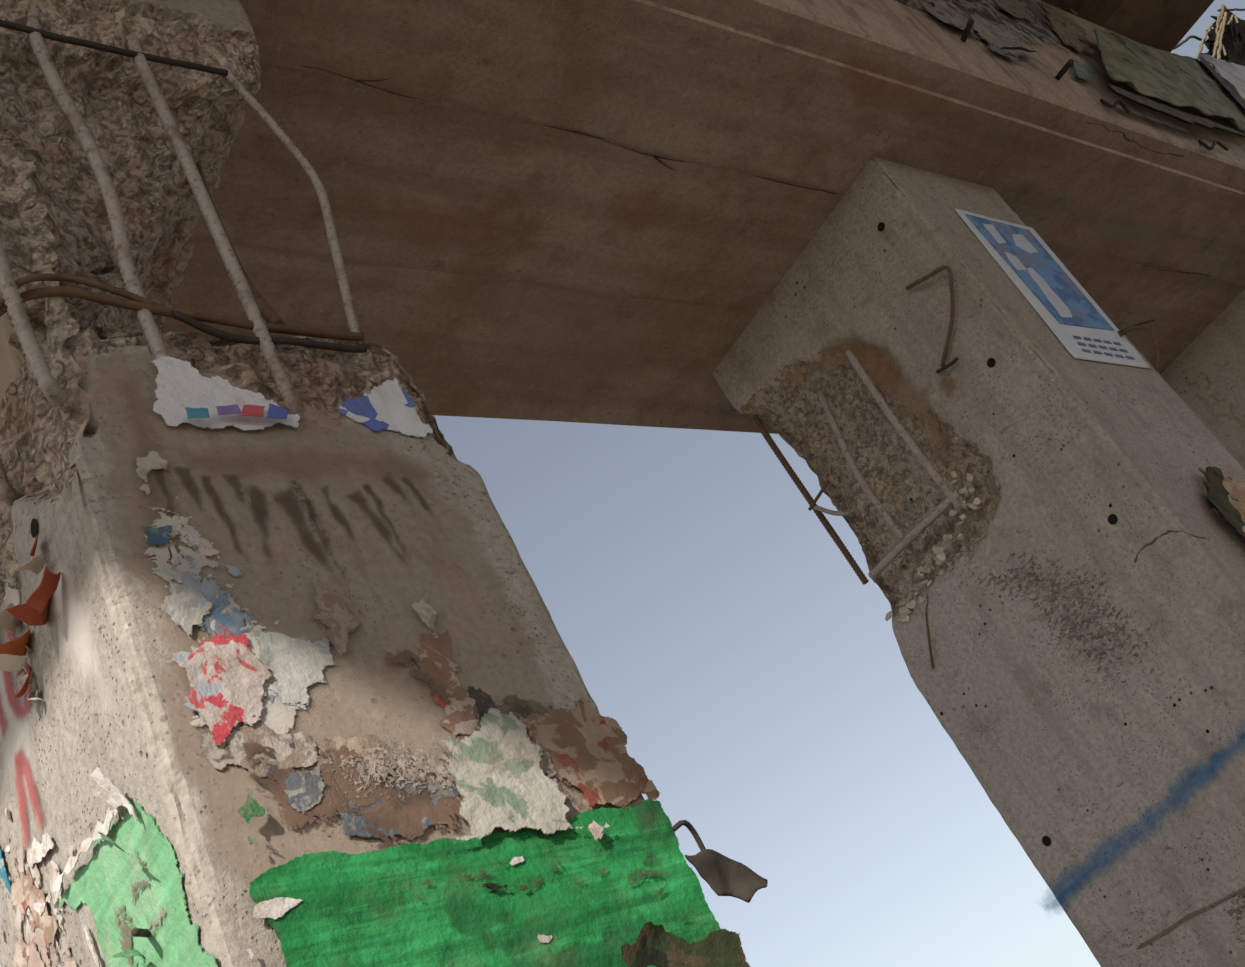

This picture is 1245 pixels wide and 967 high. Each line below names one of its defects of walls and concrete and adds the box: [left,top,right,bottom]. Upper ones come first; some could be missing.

crack [300,65,426,105]
crack [544,125,691,171]
spalling [0,0,459,703]
water stain [177,468,241,552]
water stain [227,476,328,561]
water stain [323,488,352,536]
water stain [349,485,394,540]
spalling [739,339,1169,705]